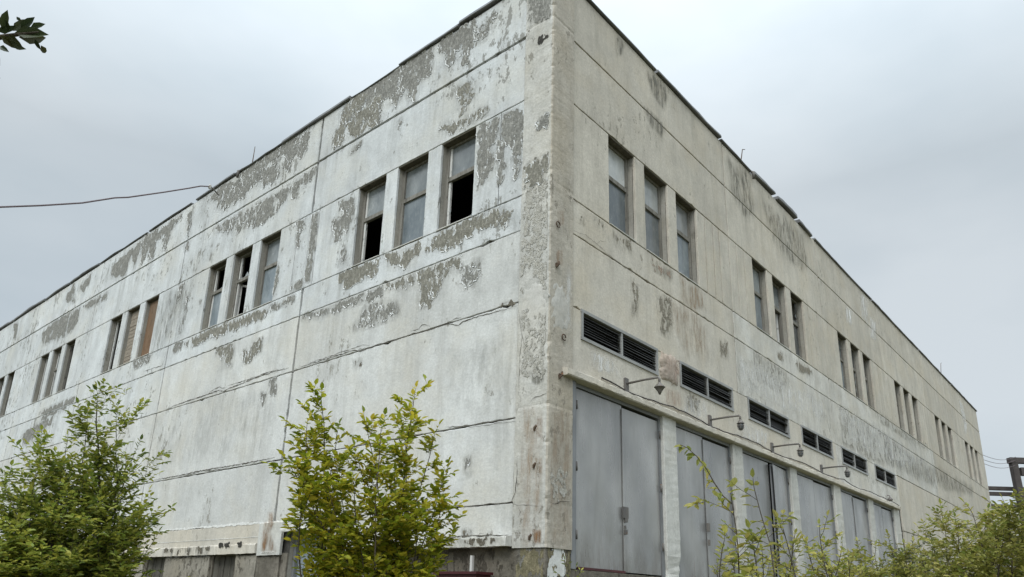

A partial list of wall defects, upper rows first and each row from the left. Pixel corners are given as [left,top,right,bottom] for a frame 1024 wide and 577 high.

peeling [331,12,498,155]
spalling [172,82,549,379]
peeling [42,274,107,343]
crack [167,306,524,409]
spalling [659,297,672,334]
crack [451,418,514,427]